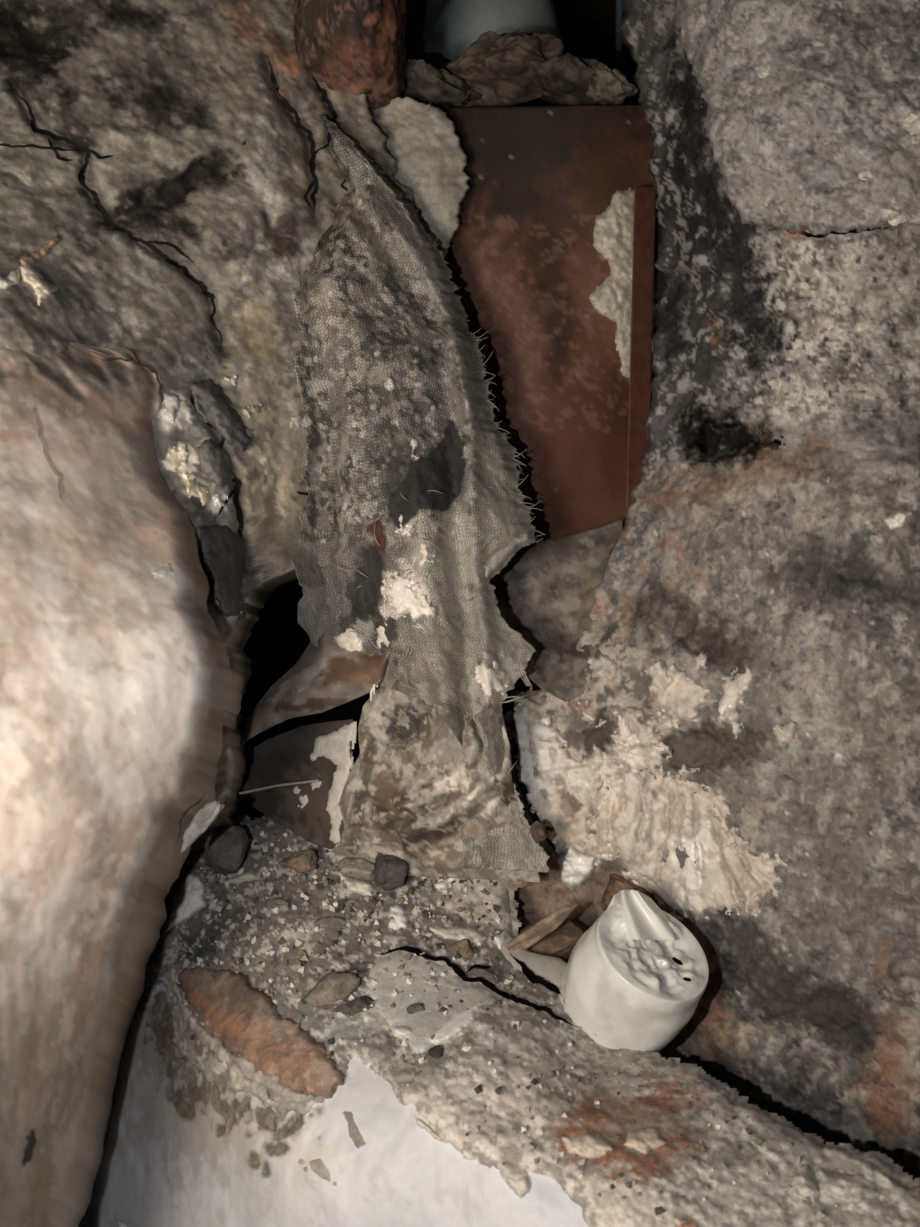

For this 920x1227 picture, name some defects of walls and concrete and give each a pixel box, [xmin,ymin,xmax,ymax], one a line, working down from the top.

water stain [902,110,920,135]
crack [0,87,222,350]
crack [771,226,891,238]
water stain [881,206,907,226]
water stain [653,275,688,381]
water stain [747,314,784,373]
water stain [676,402,712,441]
flaking render [334,515,438,651]
flaking render [474,650,790,923]
crack [379,946,597,1036]
flaking render [145,721,920,1227]
rust [552,1076,702,1184]